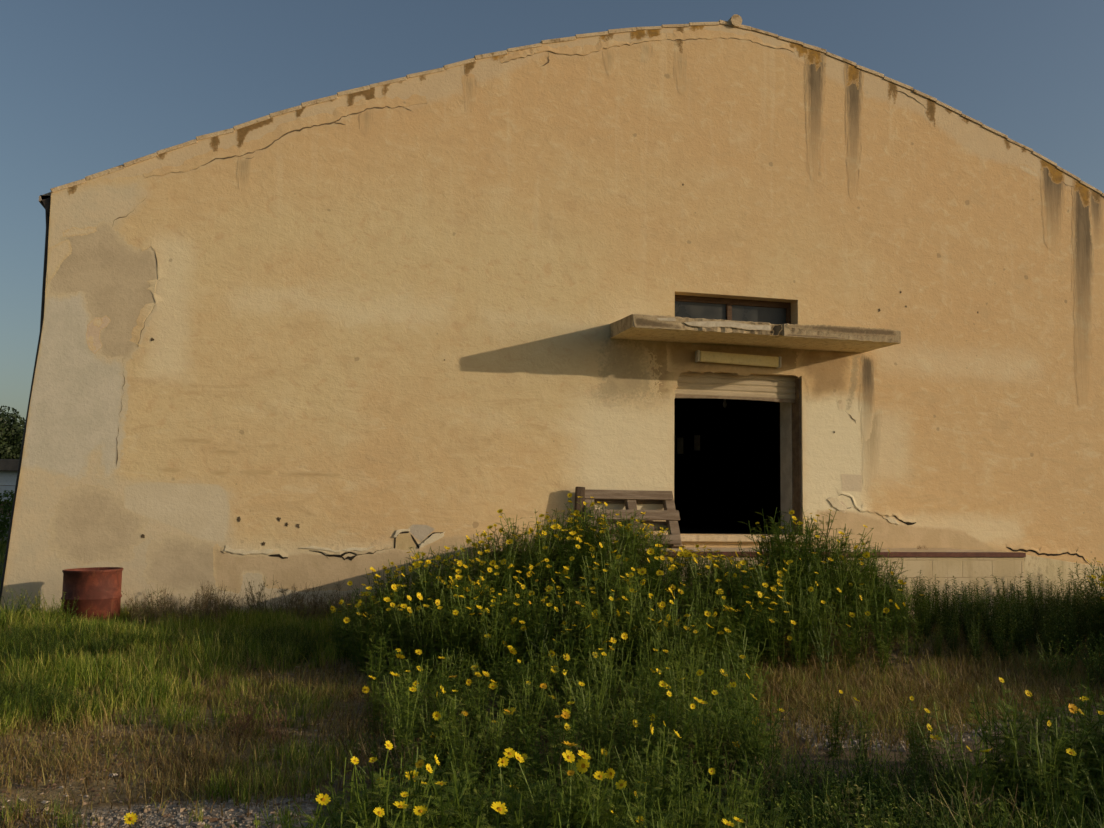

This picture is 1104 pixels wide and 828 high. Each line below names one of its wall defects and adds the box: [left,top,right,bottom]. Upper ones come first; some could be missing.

crack [499,29,795,67]
crack [112,94,427,227]
water stain [804,53,826,182]
water stain [844,62,864,200]
spalling [47,227,97,284]
water stain [1040,158,1104,406]
crack [116,236,169,465]
spalling [393,524,445,551]
crack [837,490,916,525]
crack [1006,542,1090,562]